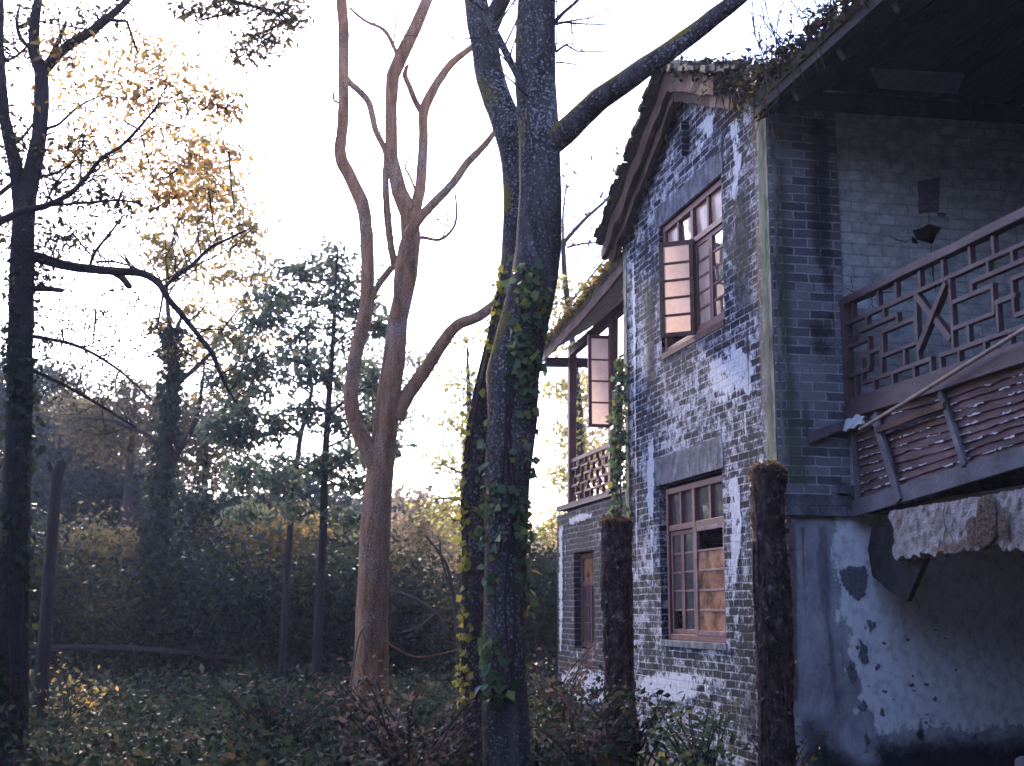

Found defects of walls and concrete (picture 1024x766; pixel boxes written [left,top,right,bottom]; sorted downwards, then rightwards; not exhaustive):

water stain [647,289,655,381]
peeling [886,374,1024,467]
peeling [829,420,1024,736]
water stain [804,724,860,766]
water stain [866,723,1024,766]